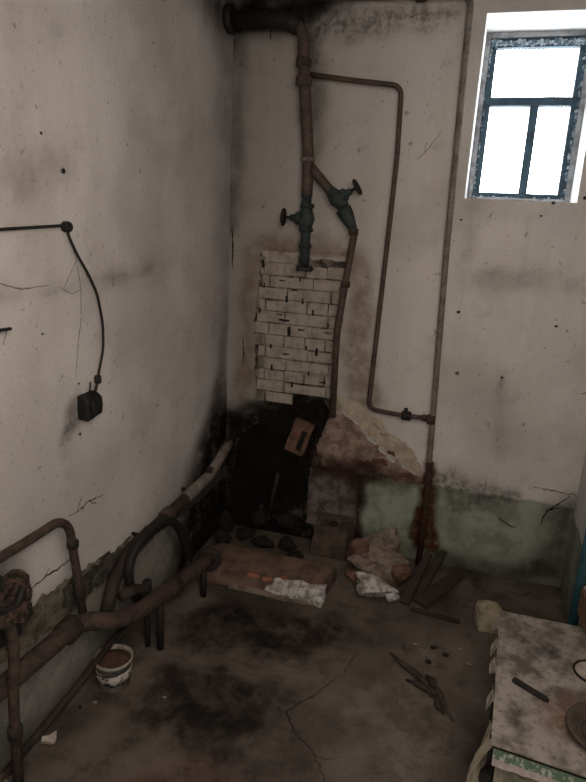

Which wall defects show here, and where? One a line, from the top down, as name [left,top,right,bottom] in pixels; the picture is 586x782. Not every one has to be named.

rust [410,466,439,551]
flaking render [18,536,135,651]
crack [278,651,359,782]